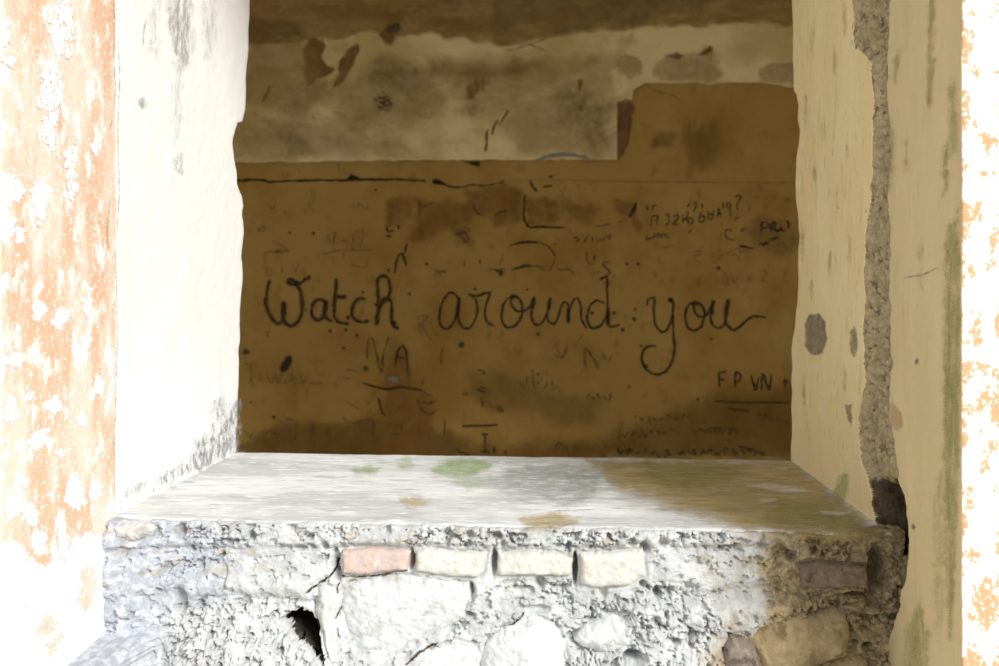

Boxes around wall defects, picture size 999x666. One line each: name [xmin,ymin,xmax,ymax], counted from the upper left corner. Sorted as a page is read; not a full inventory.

peeling [0,0,80,250]
leakage [233,0,793,175]
leakage [923,0,959,197]
peeling [0,389,63,424]
peeling [23,428,69,460]
peeling [2,471,103,546]
peeling [31,280,97,364]
crack [306,553,408,617]
spalling [67,516,905,666]
leakage [117,340,887,546]
spalling [852,0,909,589]
leakage [903,209,963,666]